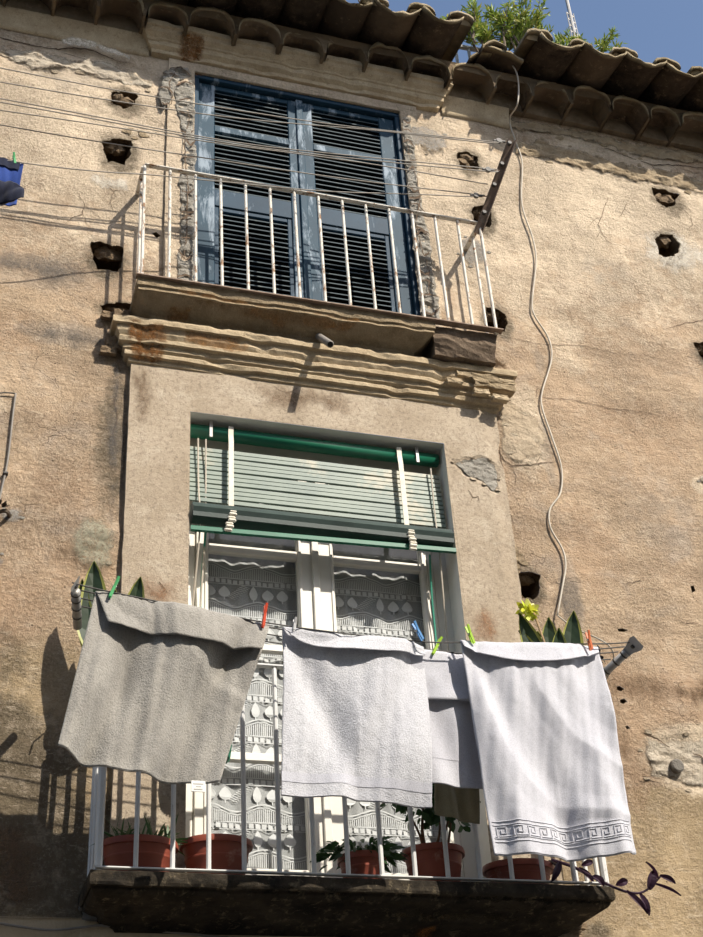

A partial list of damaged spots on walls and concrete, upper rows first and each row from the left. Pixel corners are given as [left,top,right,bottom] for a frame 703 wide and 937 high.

spalling [0,46,197,281]
corrosion [128,320,166,363]
flaking render [451,456,501,492]
crack [498,447,556,483]
flaking render [638,729,703,792]